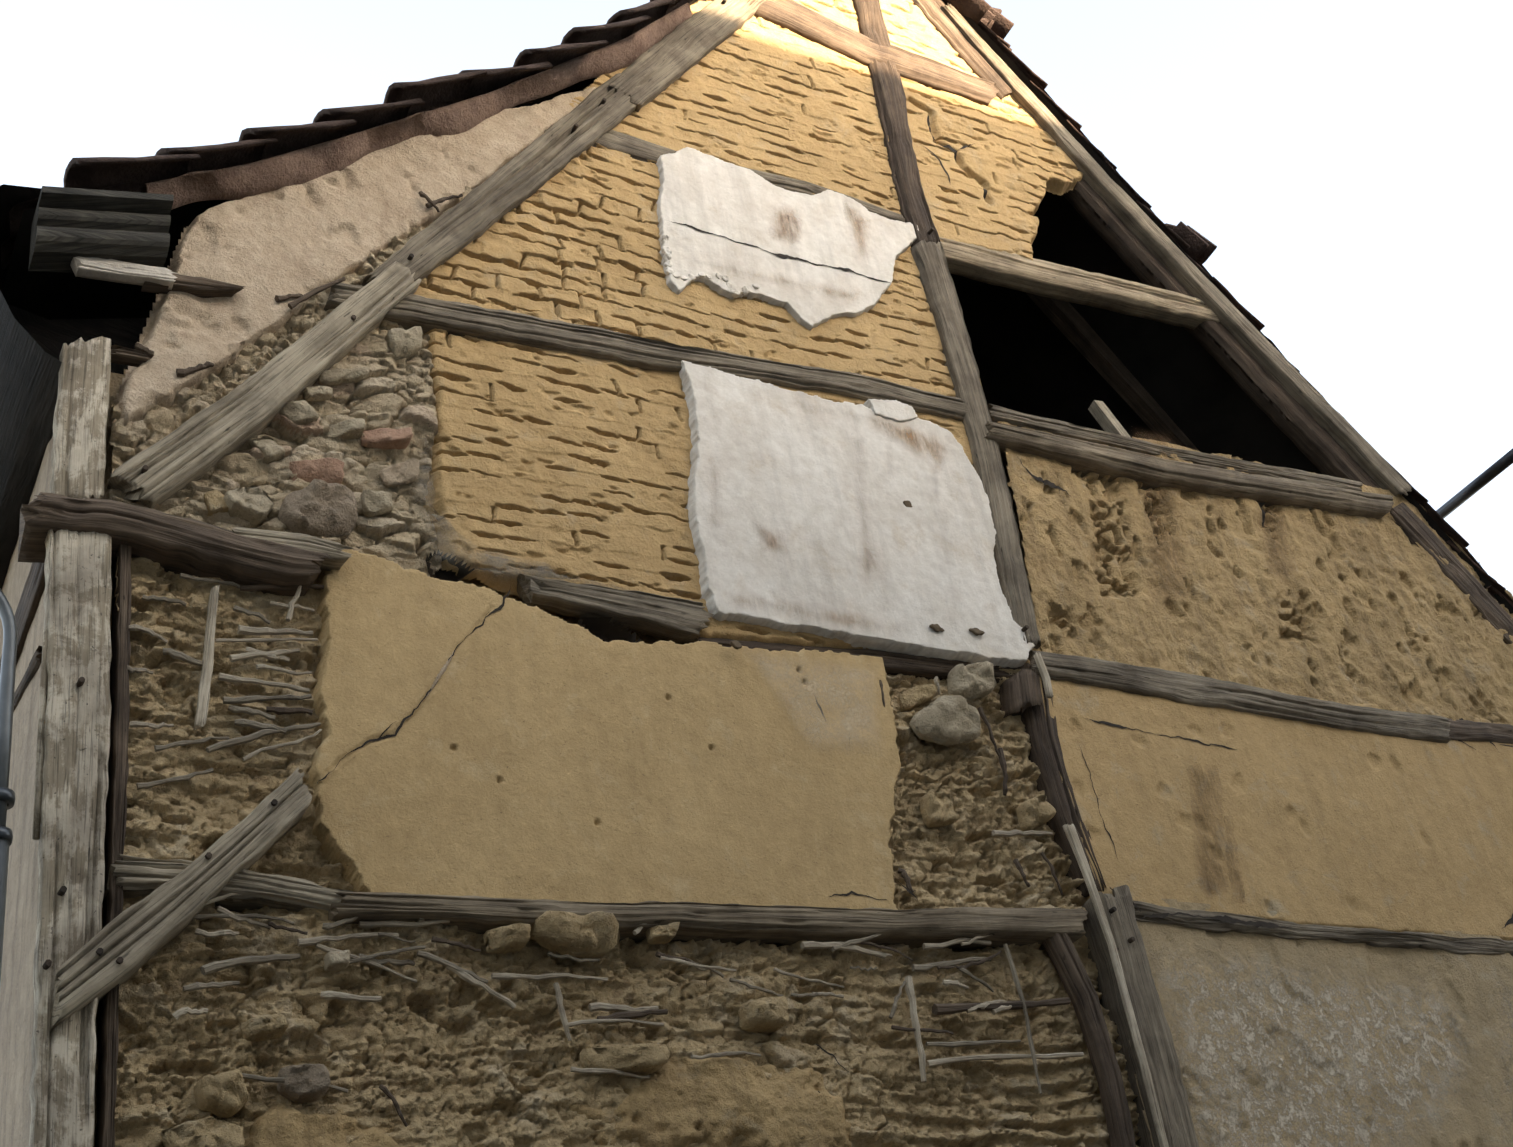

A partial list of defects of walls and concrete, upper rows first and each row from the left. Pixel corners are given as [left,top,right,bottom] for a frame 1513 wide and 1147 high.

crack [664,219,890,283]
spalling [103,186,475,582]
spalling [113,553,353,891]
crack [317,583,512,784]
peeling [679,360,1141,1147]
crack [1079,719,1288,928]
spalling [114,893,1111,1147]